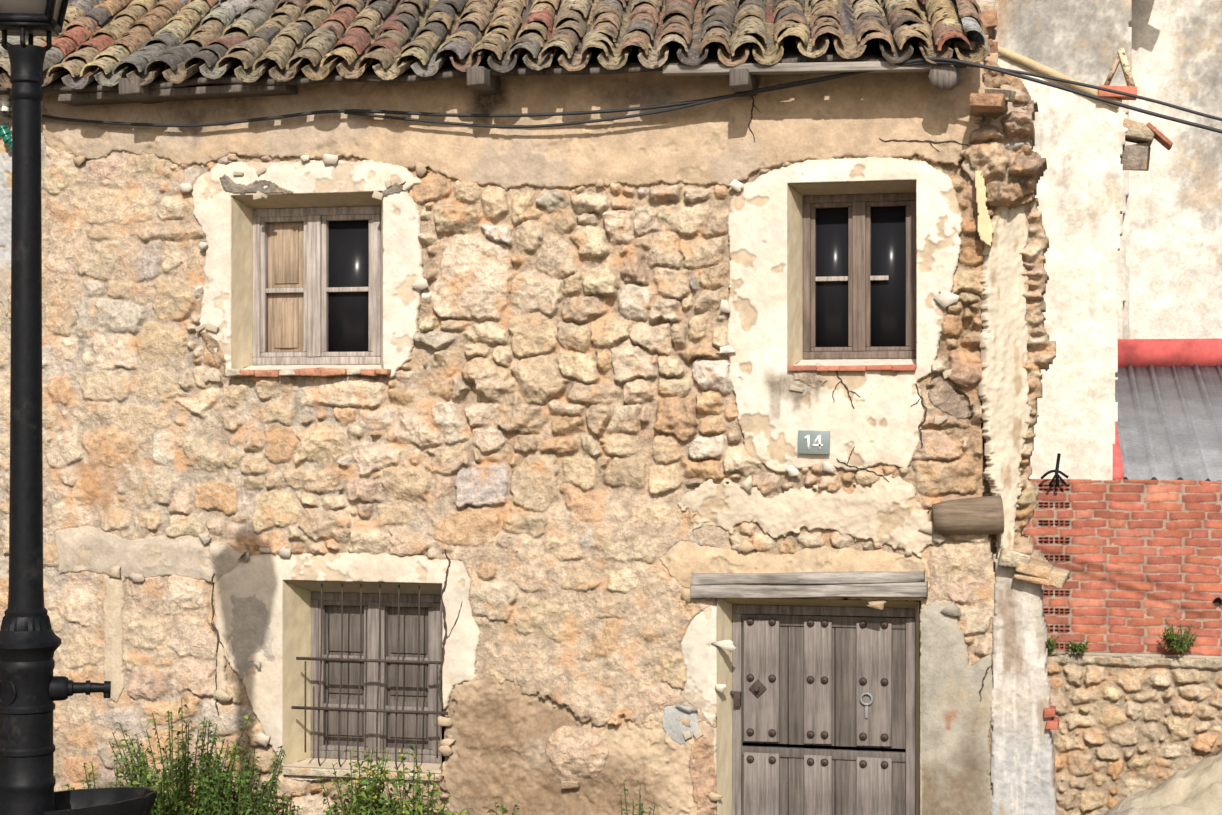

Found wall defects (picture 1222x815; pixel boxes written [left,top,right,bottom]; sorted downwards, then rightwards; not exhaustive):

crack [748,96,761,142]
crack [832,371,860,409]
flaking render [42,62,1056,815]
crack [979,649,994,701]